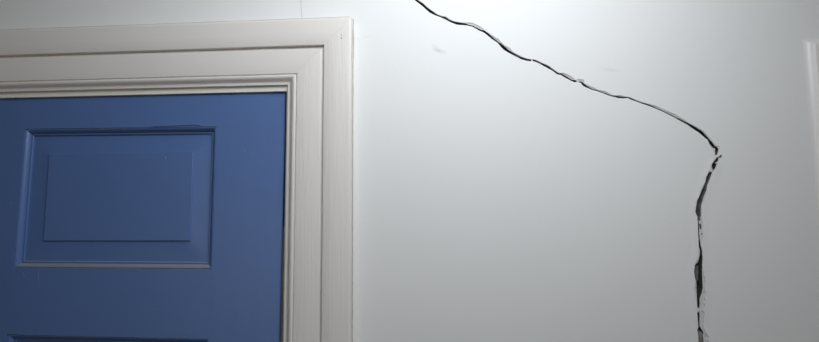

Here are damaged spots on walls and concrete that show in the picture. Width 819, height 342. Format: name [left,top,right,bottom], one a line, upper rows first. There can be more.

crack [348,173,356,342]
crack [415,0,726,342]